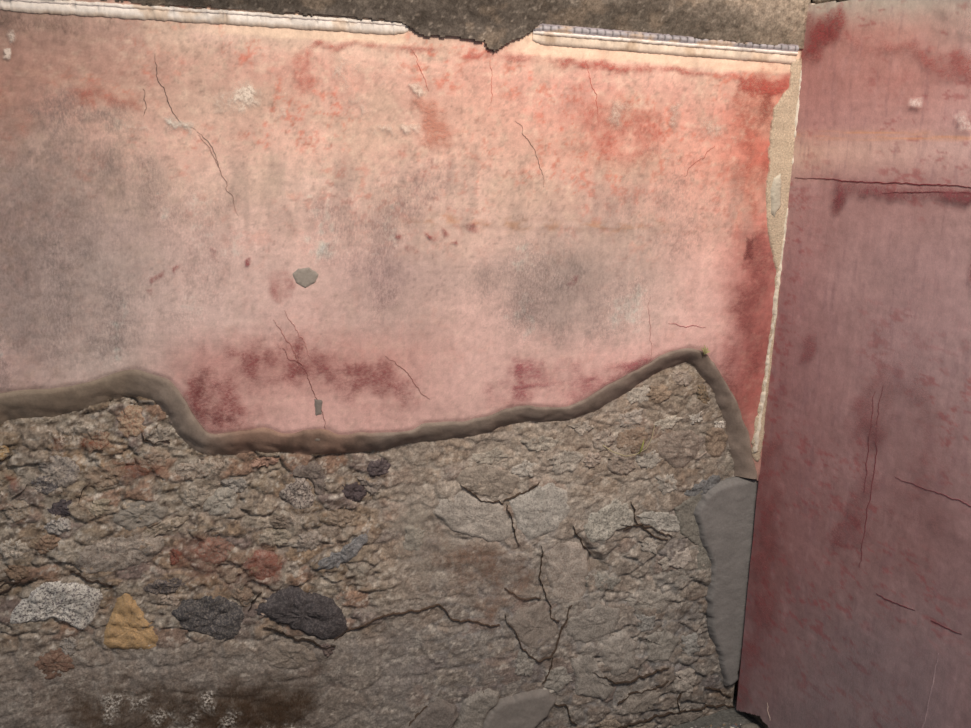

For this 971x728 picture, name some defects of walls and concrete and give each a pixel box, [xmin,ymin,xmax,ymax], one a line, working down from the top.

crack [143,62,236,211]
flaking render [0,58,802,728]
crack [248,482,572,683]
crack [624,501,673,540]
crack [592,667,734,728]